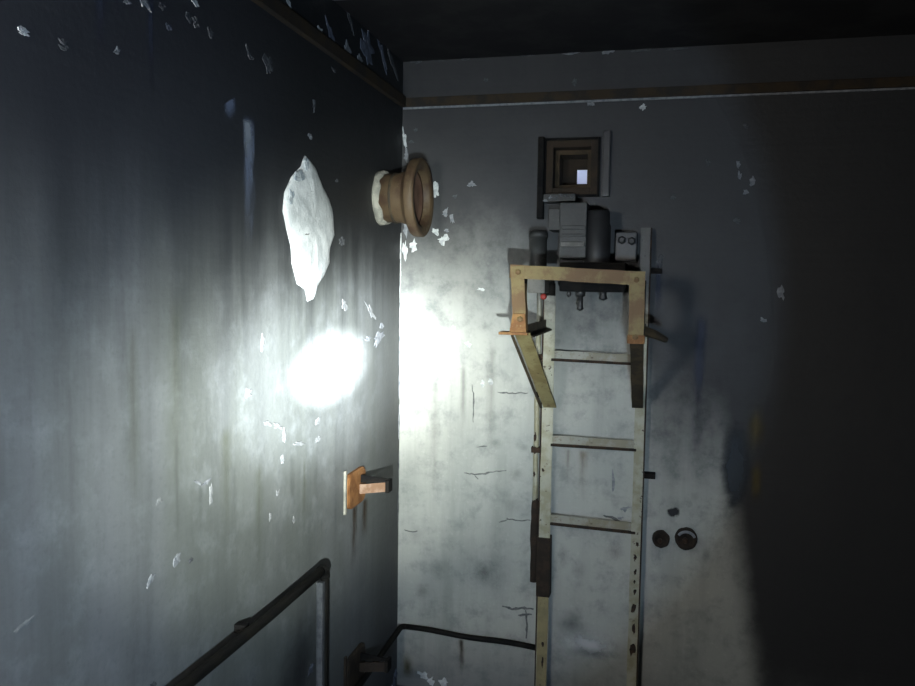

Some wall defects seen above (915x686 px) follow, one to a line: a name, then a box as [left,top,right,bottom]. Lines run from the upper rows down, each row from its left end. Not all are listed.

peeling [123,0,167,13]
peeling [185,0,214,39]
peeling [317,12,398,80]
peeling [402,126,418,170]
peeling [432,208,455,246]
crack [464,470,506,479]
crack [502,605,534,639]